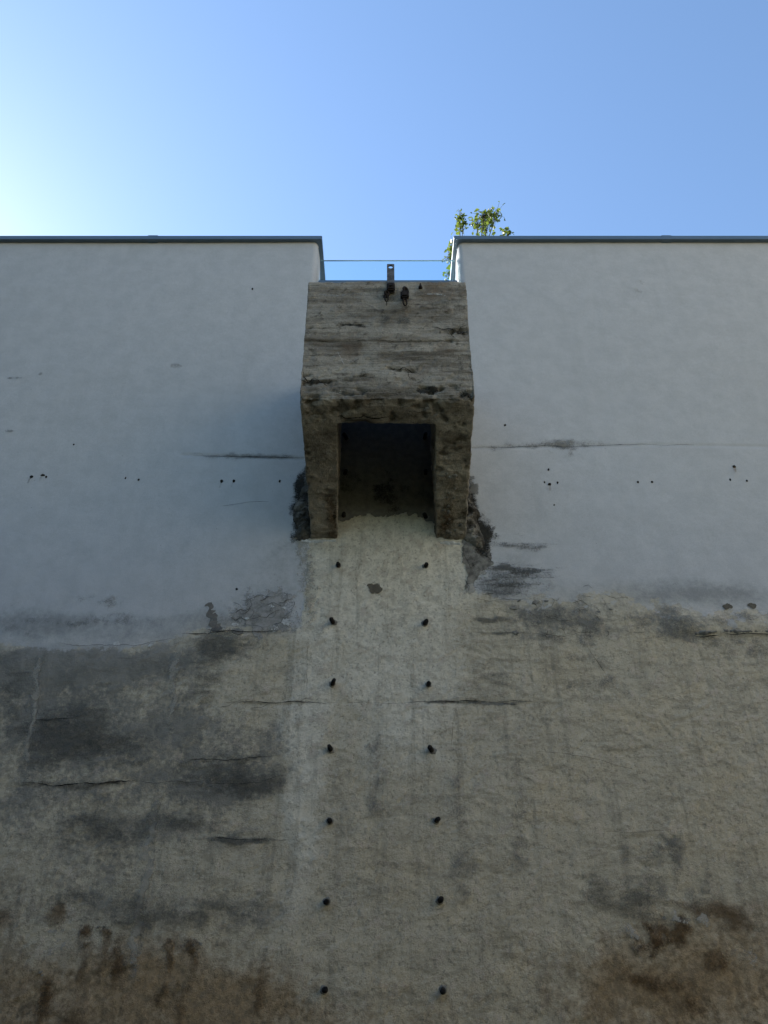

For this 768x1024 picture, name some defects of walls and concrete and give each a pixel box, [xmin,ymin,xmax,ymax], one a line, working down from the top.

spalling [290,470,311,541]
damp [486,563,541,594]
spalling [462,476,614,640]
peeling [183,588,299,640]
crack [223,693,532,742]
crack [31,756,283,788]